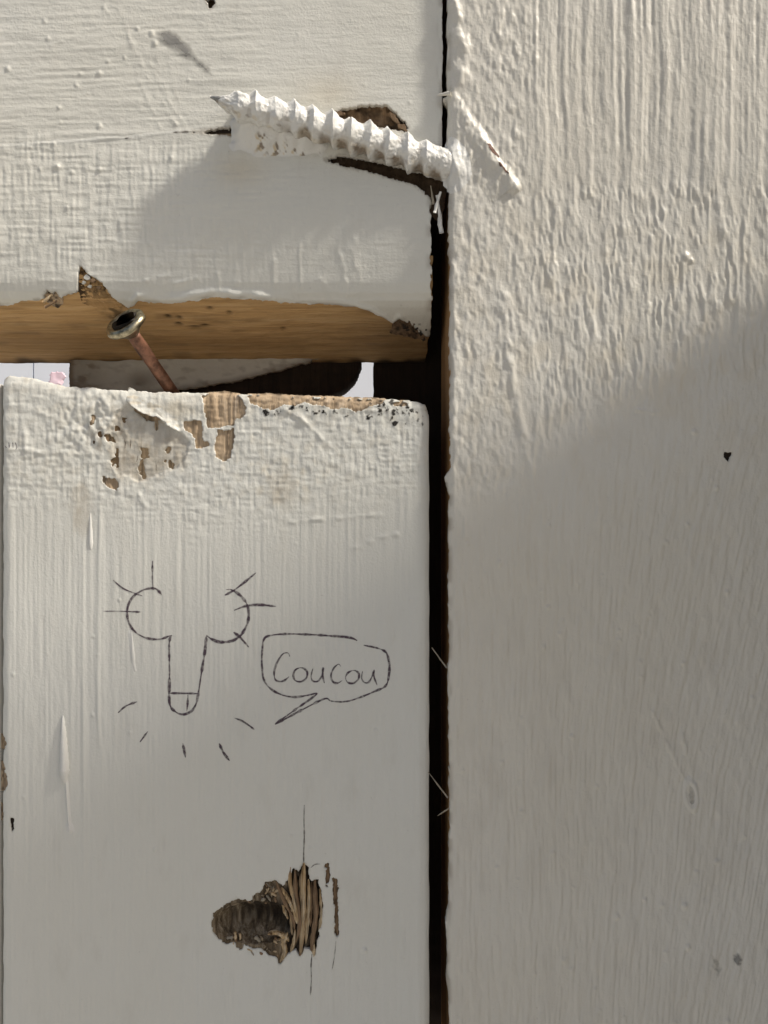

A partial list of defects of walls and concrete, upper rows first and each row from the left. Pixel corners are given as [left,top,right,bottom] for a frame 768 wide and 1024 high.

peeling [337,106,408,132]
peeling [78,267,122,309]
peeling [90,388,408,491]
hole [211,863,339,963]